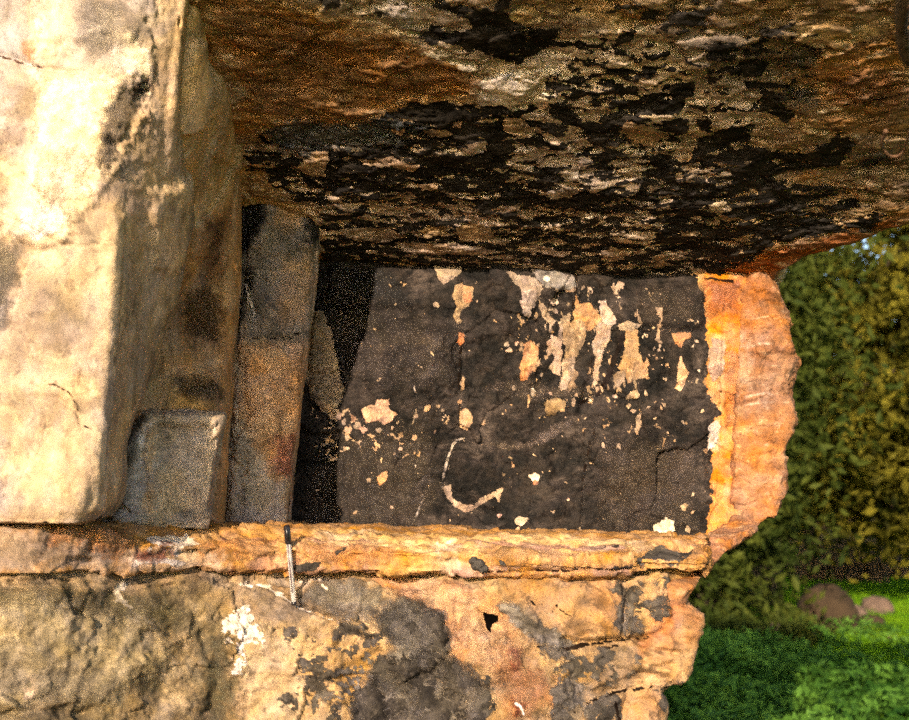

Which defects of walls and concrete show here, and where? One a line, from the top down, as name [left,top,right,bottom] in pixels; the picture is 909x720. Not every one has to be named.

peeling [370,0,431,30]
peeling [420,48,563,138]
peeling [358,156,419,172]
peeling [340,223,571,351]
peeling [500,268,727,454]
peeling [305,310,422,486]
peeling [457,375,485,430]
peeling [442,485,504,521]
peeling [515,516,529,530]
peeling [653,517,690,533]
damp [240,581,311,612]
damp [207,605,266,715]